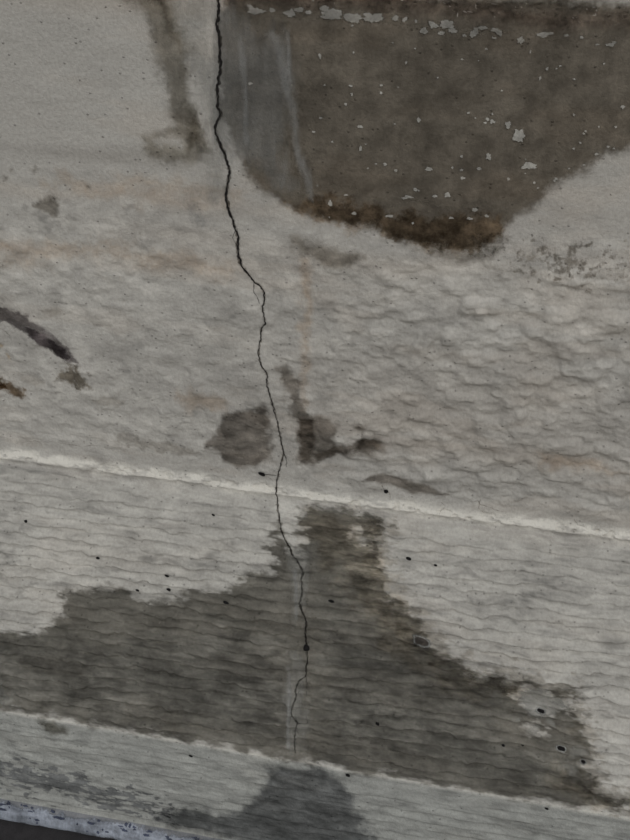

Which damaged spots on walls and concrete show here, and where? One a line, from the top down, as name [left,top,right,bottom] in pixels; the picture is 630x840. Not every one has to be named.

water stain [220,0,630,248]
crack [214,0,308,750]
water stain [269,546,291,571]